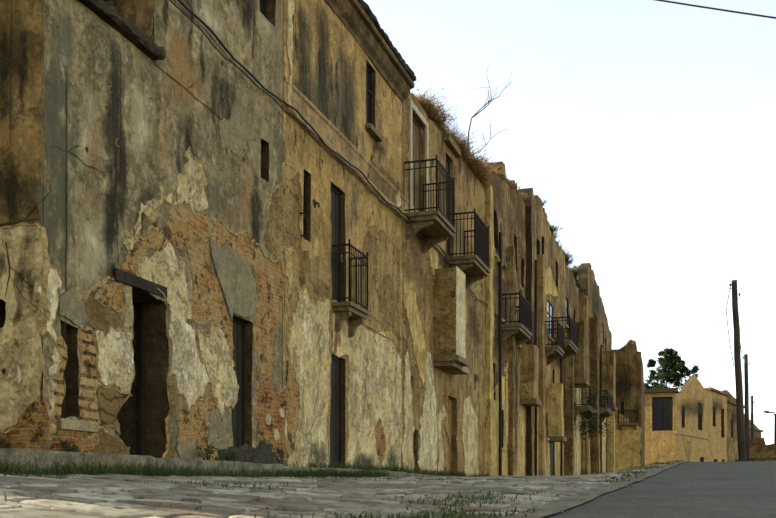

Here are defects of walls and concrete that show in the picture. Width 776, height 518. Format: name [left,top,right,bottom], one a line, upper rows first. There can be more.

flaking render [0,222,135,455]
flaking render [121,162,331,465]